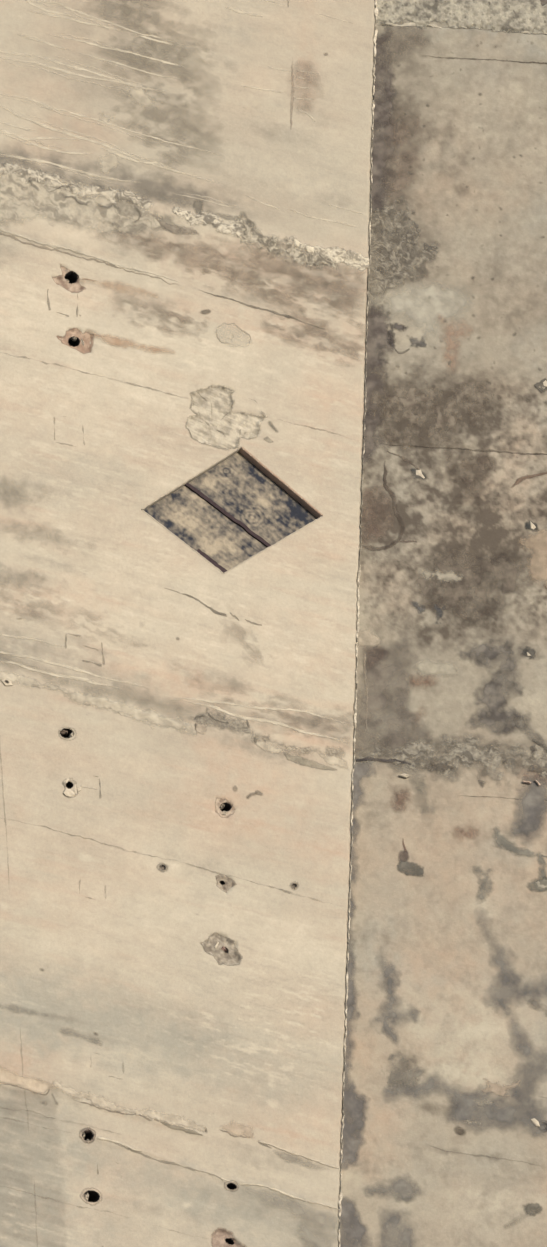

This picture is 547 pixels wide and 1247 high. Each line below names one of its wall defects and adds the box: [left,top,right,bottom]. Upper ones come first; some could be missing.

rust [89,334,163,352]
spalling [186,386,277,449]
water stain [413,530,547,623]
spalling [338,0,547,1247]
water stain [460,642,543,743]
water stain [340,645,427,1168]
spalling [201,932,242,966]
water stain [377,966,547,1135]
crack [1,1082,50,1095]
crack [82,1102,271,1148]
spalling [212,1229,242,1247]
water stain [266,1196,366,1247]